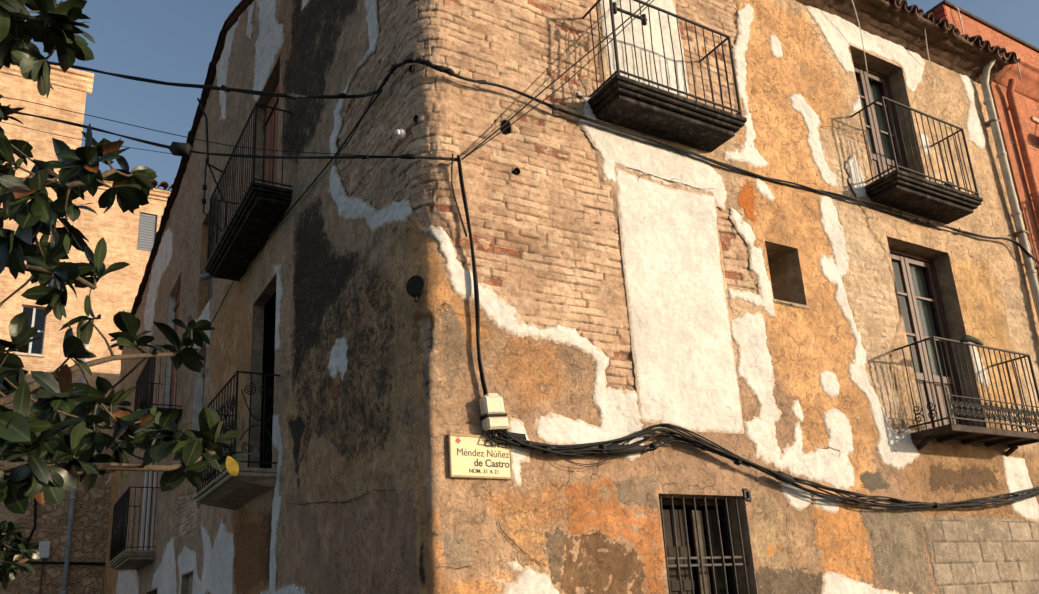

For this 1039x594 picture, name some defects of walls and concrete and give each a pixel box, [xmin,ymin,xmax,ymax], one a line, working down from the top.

water stain [283,0,356,165]
spalling [675,0,736,114]
spalling [336,0,635,404]
spalling [716,207,756,293]
water stain [286,196,395,488]
crack [286,489,417,514]
peeling [499,477,666,594]